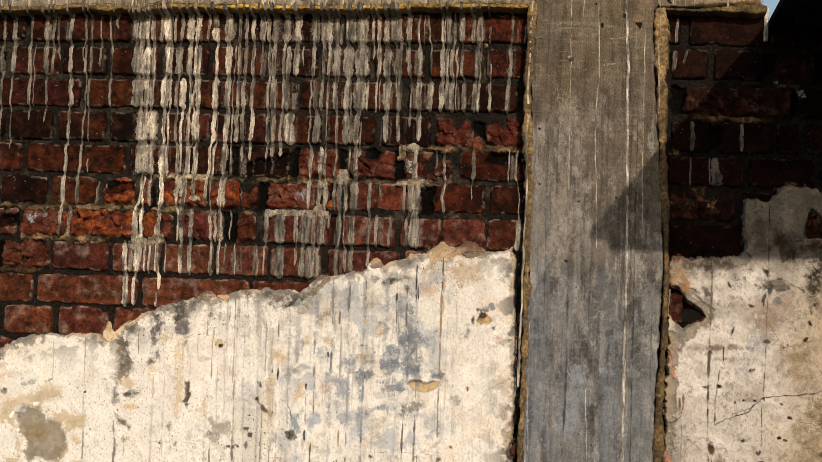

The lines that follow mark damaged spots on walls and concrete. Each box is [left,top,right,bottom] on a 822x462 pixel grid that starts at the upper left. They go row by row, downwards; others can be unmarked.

peeling [370,258,383,269]
peeling [426,241,486,265]
peeling [198,291,229,301]
peeling [103,315,142,342]
spalling [464,303,495,338]
spalling [677,301,701,330]
water stain [203,337,235,462]
water stain [259,252,479,462]
peeling [409,379,439,392]
crack [715,301,822,441]
water stain [0,386,85,462]